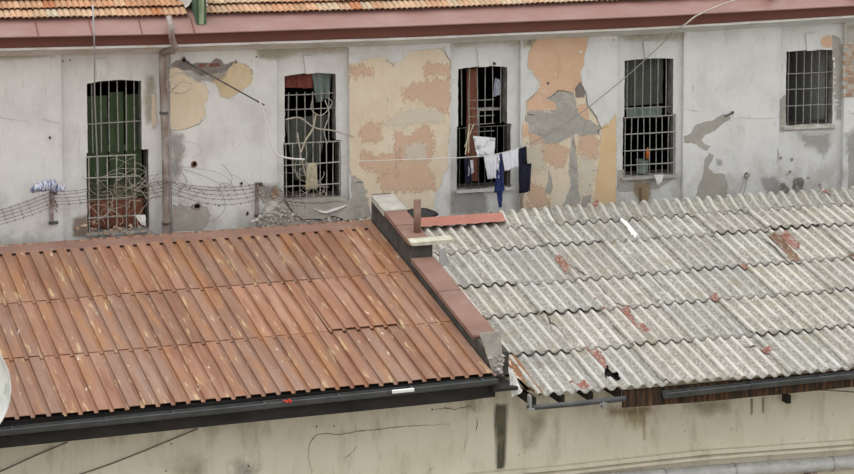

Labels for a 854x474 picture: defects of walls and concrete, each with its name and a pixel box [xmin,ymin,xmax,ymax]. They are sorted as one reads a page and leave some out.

peeling [169,56,257,130]
peeling [261,48,452,227]
peeling [520,37,674,210]
flaking render [820,31,854,107]
rust [0,217,495,420]
spalling [488,353,505,376]
damp [495,404,506,468]